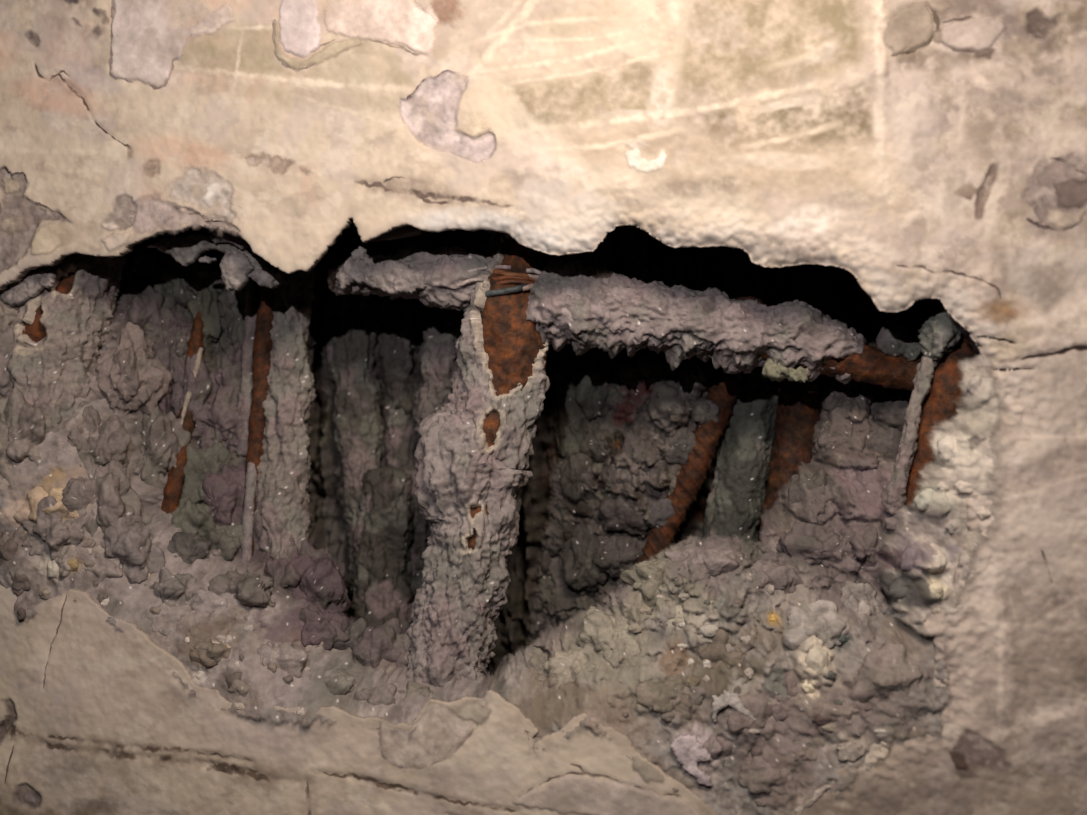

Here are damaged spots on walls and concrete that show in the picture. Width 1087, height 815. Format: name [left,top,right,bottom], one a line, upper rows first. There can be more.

peeling [272,0,438,70]
peeling [885,0,1006,58]
spalling [1026,9,1057,37]
crack [35,64,130,147]
spalling [399,70,496,162]
crack [360,177,495,205]
spalling [1023,157,1087,230]
crack [952,322,1087,371]
spalling [0,166,1005,815]
rust [760,377,912,591]
crack [107,745,267,780]
crack [306,772,477,815]